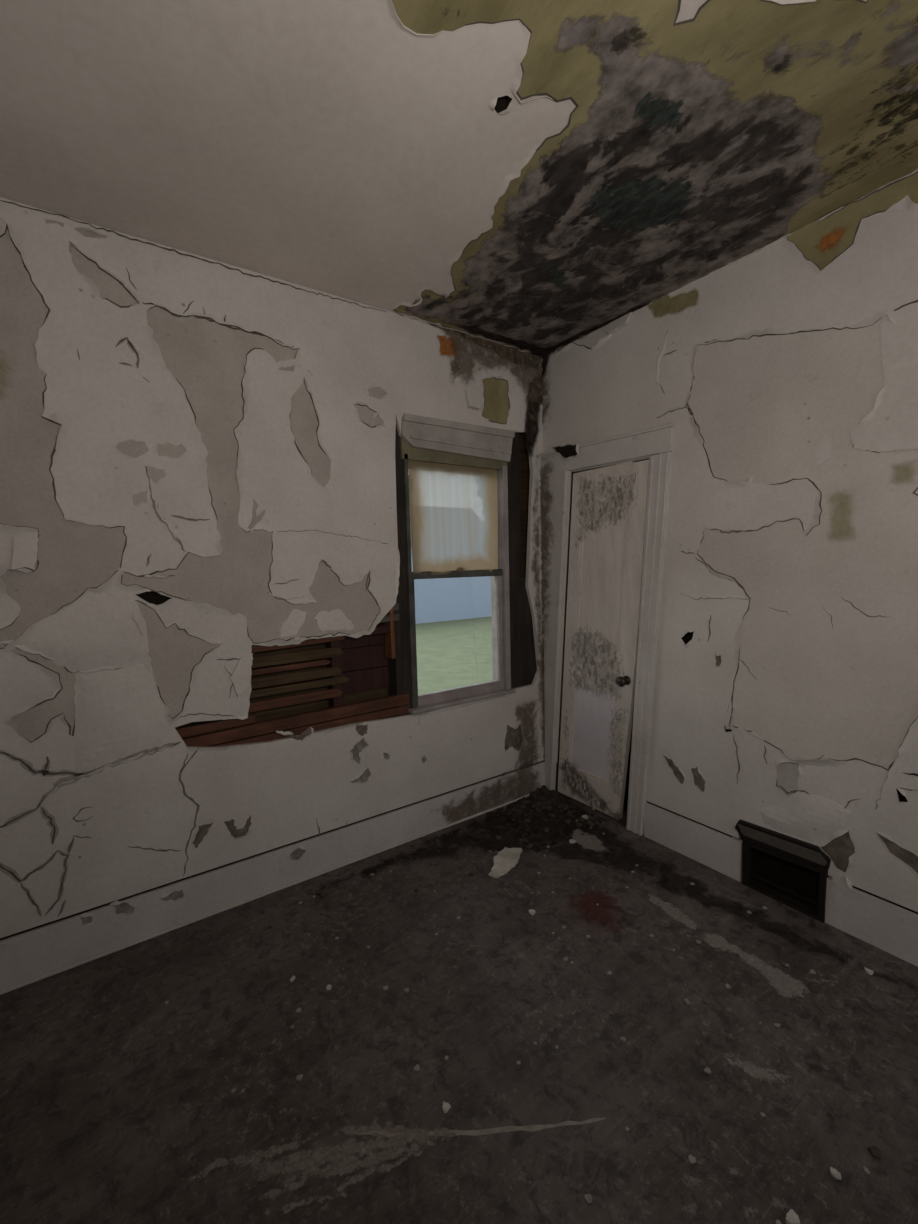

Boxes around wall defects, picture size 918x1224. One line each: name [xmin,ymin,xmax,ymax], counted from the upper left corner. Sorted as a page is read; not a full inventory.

peeling [386,0,918,357]
water stain [397,3,918,456]
peeling [0,217,400,743]
water stain [443,465,552,823]
peeling [479,375,519,431]
crack [681,524,789,680]
peeling [687,304,918,796]
crack [822,596,884,628]
crack [0,658,241,917]
water stain [562,761,621,822]
spalling [817,830,856,873]
crack [901,772,918,793]